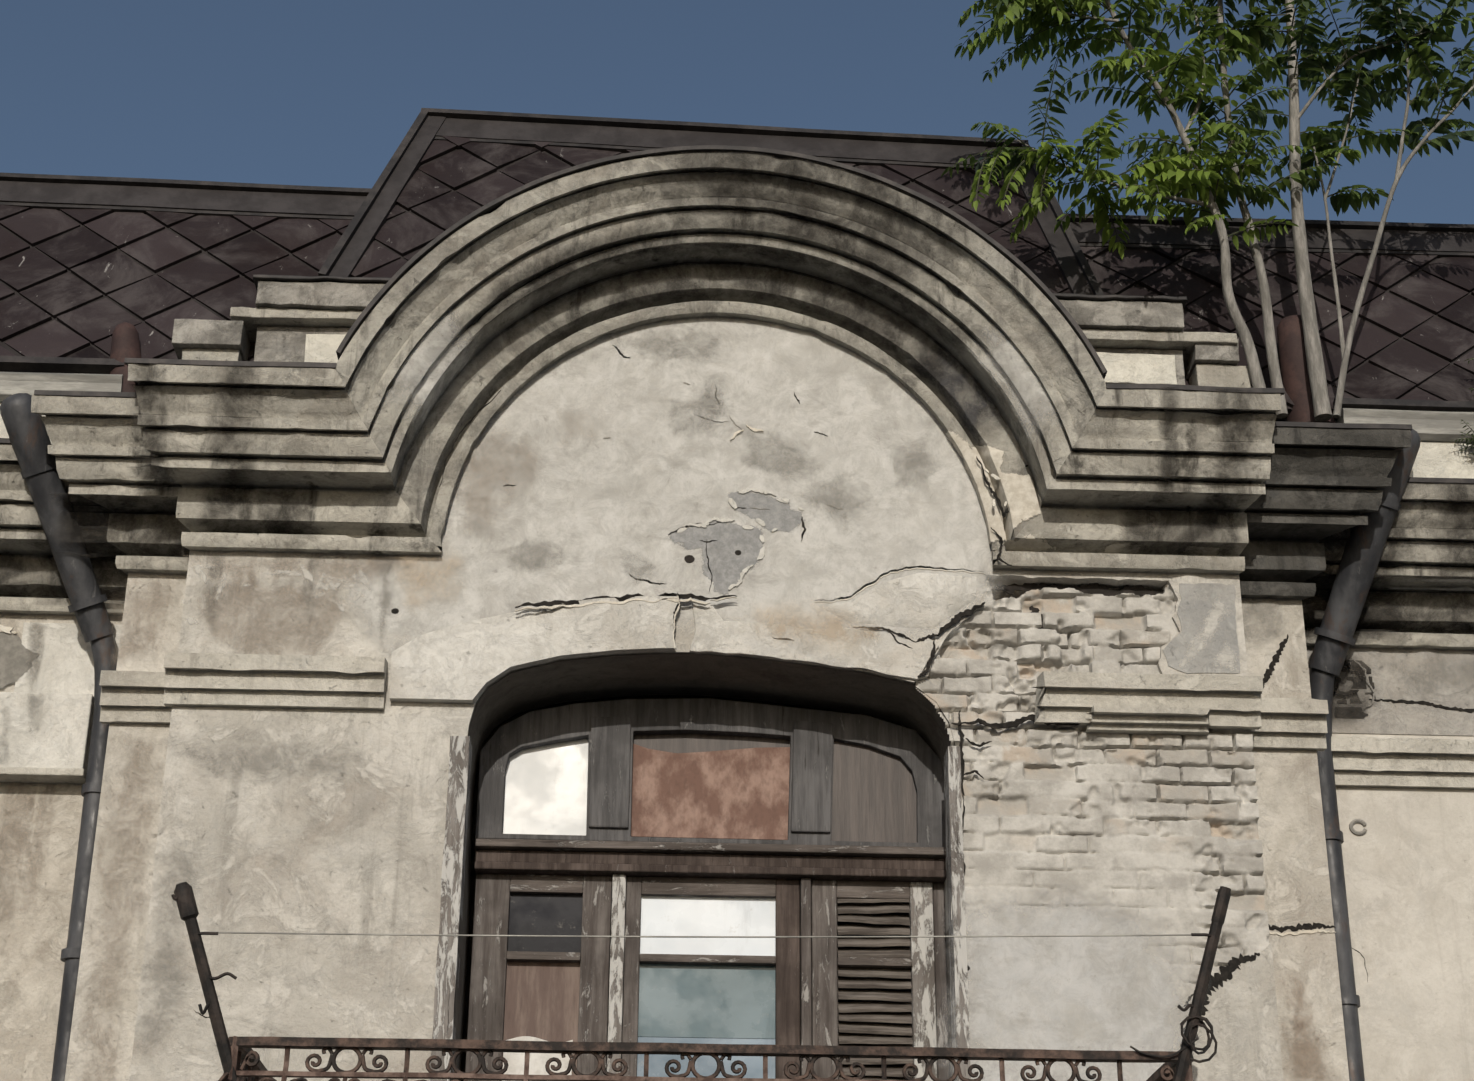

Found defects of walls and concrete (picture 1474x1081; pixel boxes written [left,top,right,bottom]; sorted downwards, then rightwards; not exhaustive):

water stain [490,151,999,434]
water stain [394,326,468,421]
water stain [204,366,309,535]
water stain [1128,387,1249,555]
peeling [0,625,39,688]
crack [515,522,737,651]
peeling [670,488,804,595]
crack [816,566,985,677]
flaking render [916,456,1270,994]
crack [1261,634,1289,694]
crack [1369,699,1474,713]
crack [1180,922,1368,1062]